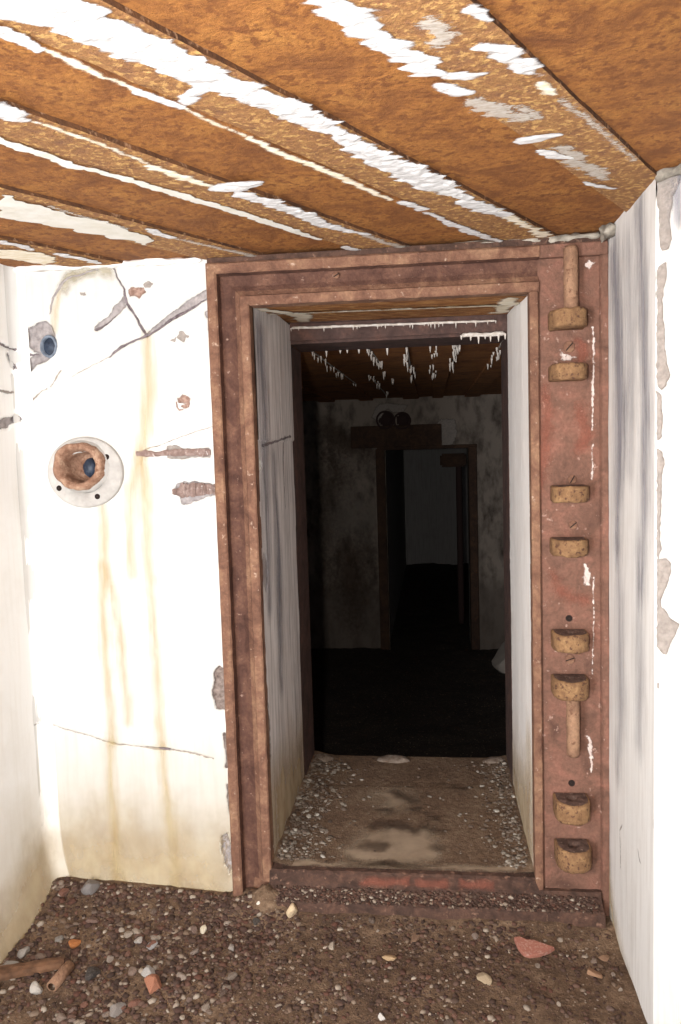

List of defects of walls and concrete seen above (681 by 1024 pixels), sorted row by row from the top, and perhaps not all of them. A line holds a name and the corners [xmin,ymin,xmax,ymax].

rust [129,287,146,298]
spalling [28,321,55,371]
crack [20,268,207,419]
rust [176,395,190,411]
peeling [656,175,680,654]
spalling [175,481,214,505]
spalling [212,666,225,709]
crack [97,738,214,759]
spalling [222,833,232,871]